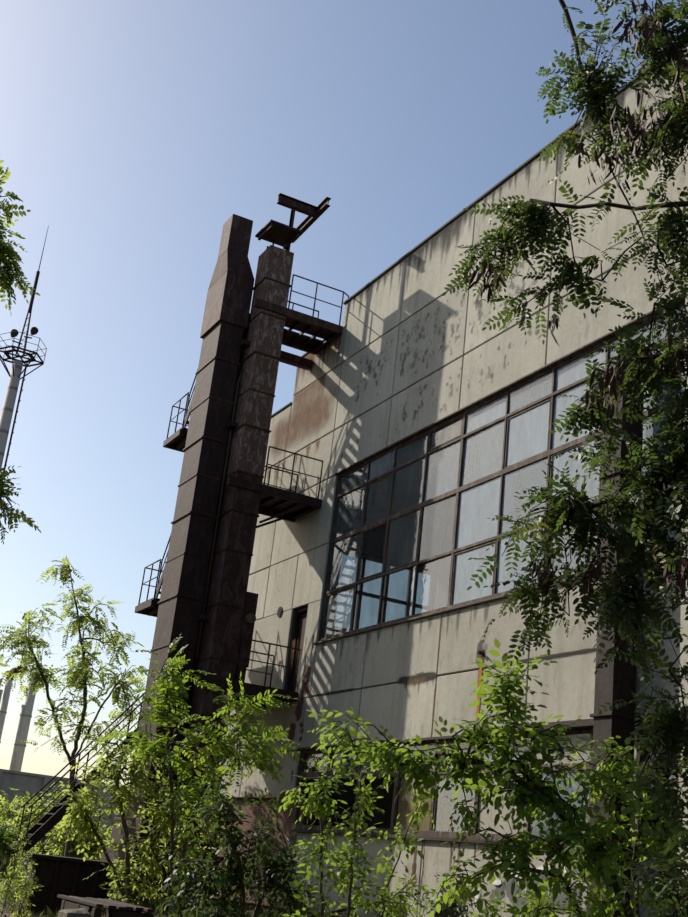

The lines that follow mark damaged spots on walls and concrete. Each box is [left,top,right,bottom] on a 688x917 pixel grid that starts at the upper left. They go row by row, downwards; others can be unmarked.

damp [484,118,600,204]
damp [349,209,473,308]
rust [274,335,341,450]
spalling [503,648,596,666]
spalling [287,680,354,743]